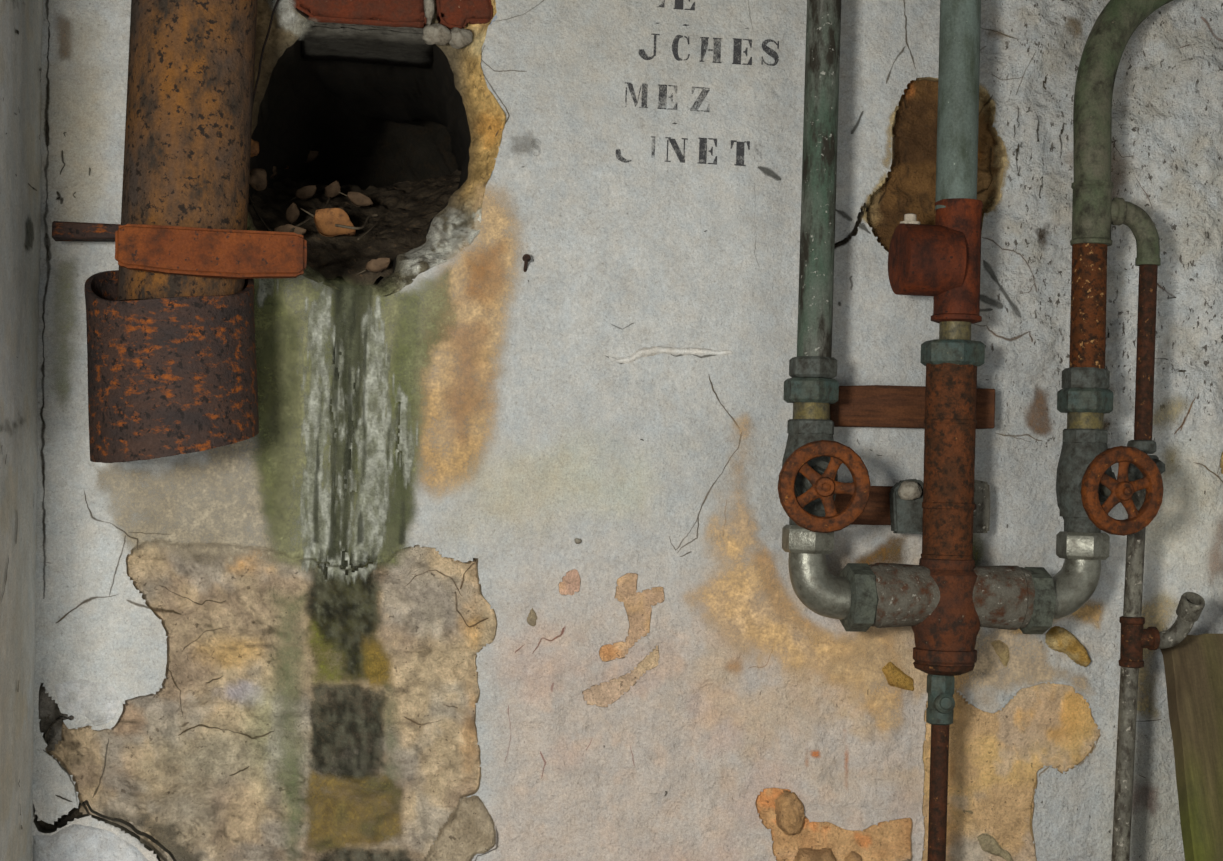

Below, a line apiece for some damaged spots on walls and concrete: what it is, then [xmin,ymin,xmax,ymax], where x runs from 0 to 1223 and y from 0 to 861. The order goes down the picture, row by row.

hole [247,0,506,296]
spalling [836,77,938,252]
crack [886,1,916,84]
spalling [977,84,1009,231]
crack [982,28,1035,94]
rust [417,192,516,493]
water stain [99,285,418,782]
crack [33,739,176,861]
spalling [38,543,498,861]
mould [319,848,411,861]
peeling [755,701,931,861]
peeling [946,682,1101,861]